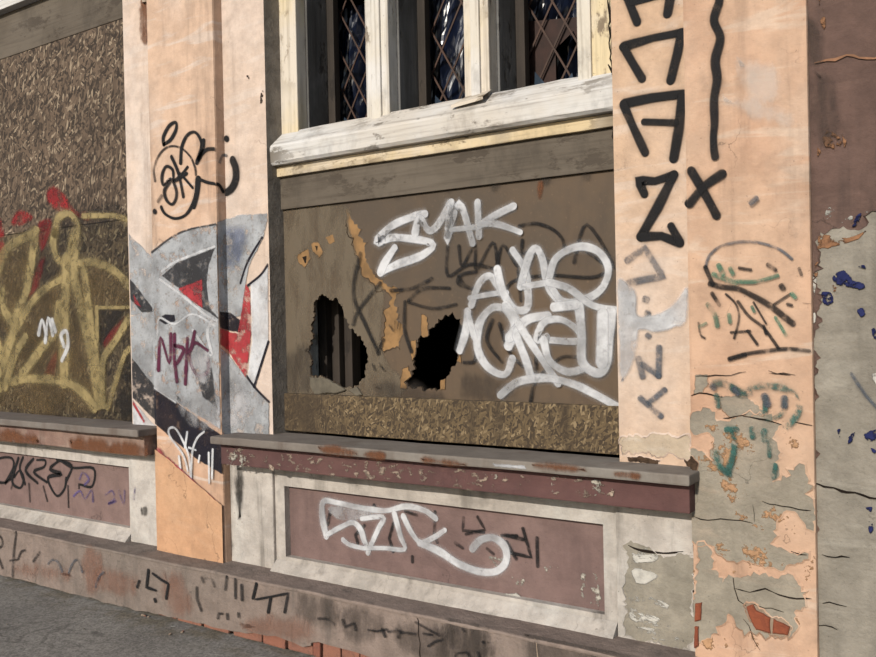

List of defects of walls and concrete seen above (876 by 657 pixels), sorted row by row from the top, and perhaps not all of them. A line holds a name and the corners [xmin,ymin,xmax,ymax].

peeling [283,204,405,397]
flaking render [618,207,876,657]
crack [694,501,811,523]
crack [816,483,876,499]
flaking render [159,614,368,657]